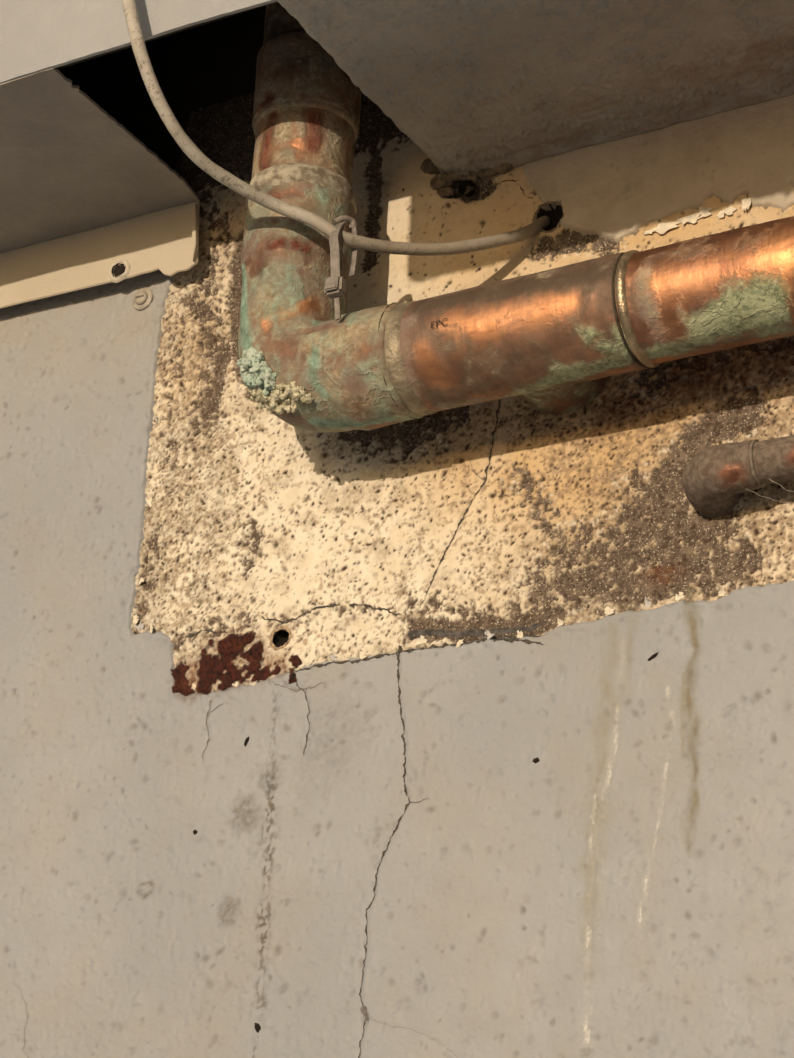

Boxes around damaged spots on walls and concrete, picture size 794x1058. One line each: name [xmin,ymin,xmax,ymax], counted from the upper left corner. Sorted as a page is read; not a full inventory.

peeling [131,92,794,694]
crack [262,399,501,624]
crack [178,629,217,651]
corrosion [171,631,302,696]
crack [274,634,539,1058]